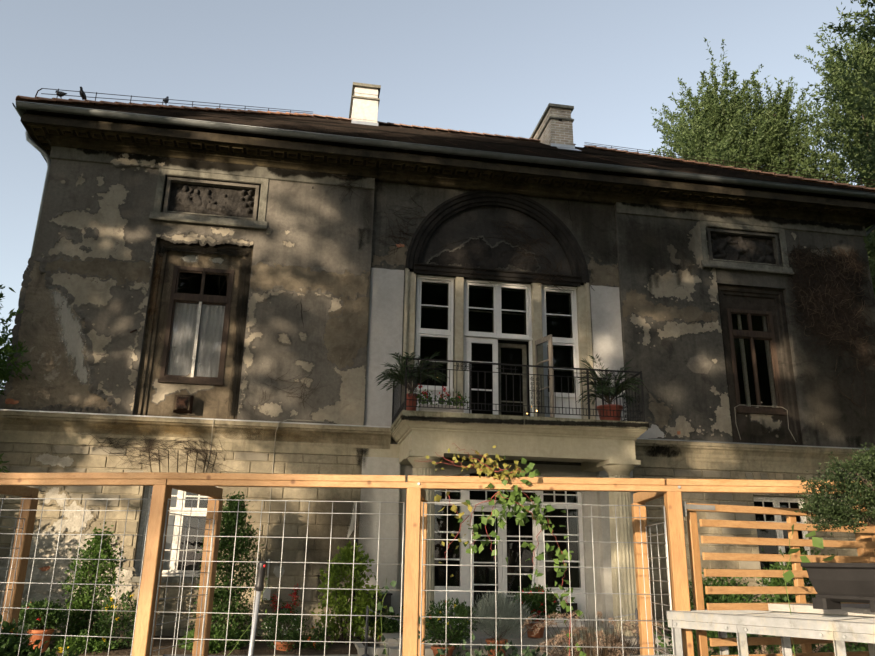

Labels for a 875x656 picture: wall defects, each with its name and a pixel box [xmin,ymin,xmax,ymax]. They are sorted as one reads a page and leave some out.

peeling [109,153,166,172]
spalling [0,174,254,414]
spalling [237,243,409,425]
peeling [646,384,732,440]
spalling [0,531,16,617]
spalling [21,486,137,619]